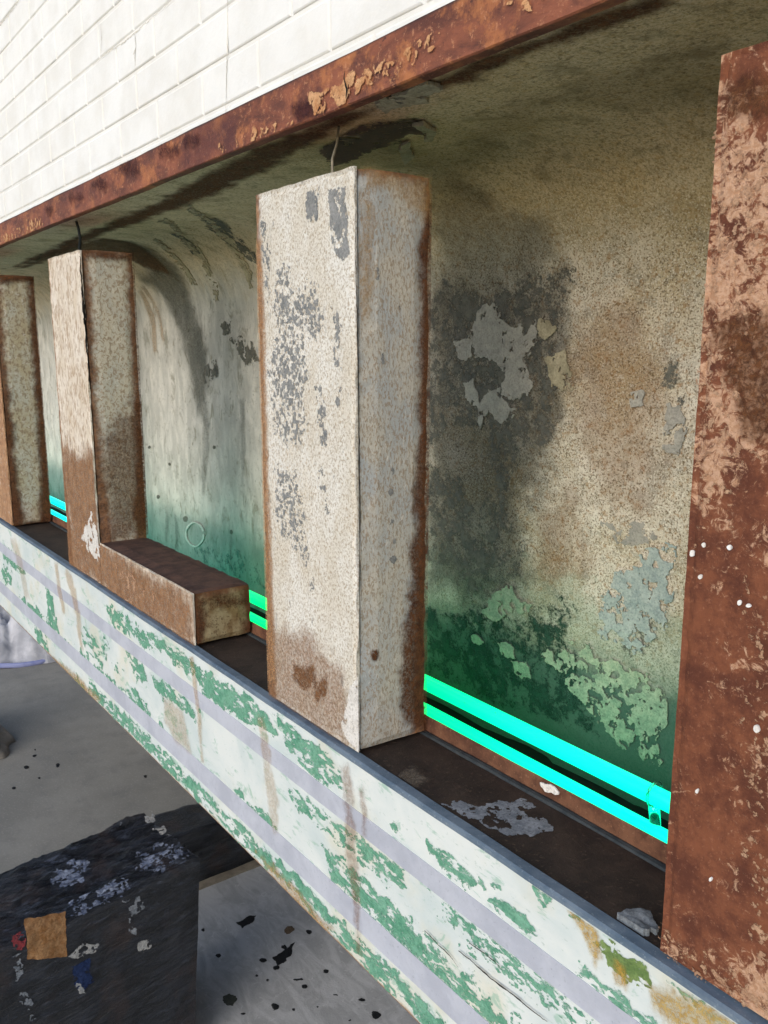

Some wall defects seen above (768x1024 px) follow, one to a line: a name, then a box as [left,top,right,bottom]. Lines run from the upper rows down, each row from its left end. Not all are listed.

peeling [308,32,443,166]
corrosion [437,0,672,88]
peeling [81,511,100,561]
corrosion [61,273,246,644]
corrosion [0,99,366,526]
peeling [187,204,344,450]
corrosion [256,242,345,728]
peeling [305,186,350,260]
corrosion [400,210,432,728]
peeling [425,259,677,770]
corrosion [715,313,768,439]
peeling [288,789,594,1024]